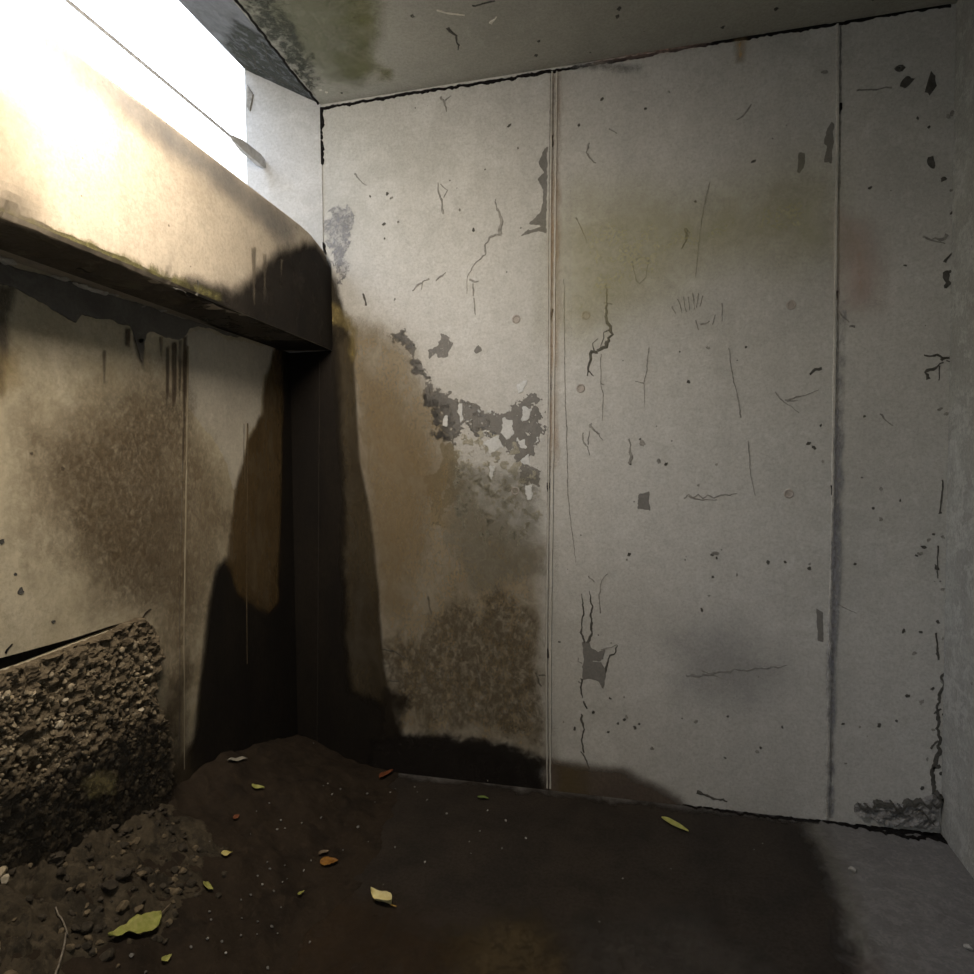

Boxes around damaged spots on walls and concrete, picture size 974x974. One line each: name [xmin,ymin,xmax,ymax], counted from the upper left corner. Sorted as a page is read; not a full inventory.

crack [412,199,504,315]
peeling [388,328,547,546]
crack [563,279,614,558]
crack [626,439,634,464]
crack [937,480,945,513]
crack [0,609,152,669]
water stain [0,207,859,974]
crack [580,714,590,768]
crack [930,633,944,795]
spalling [854,785,944,831]